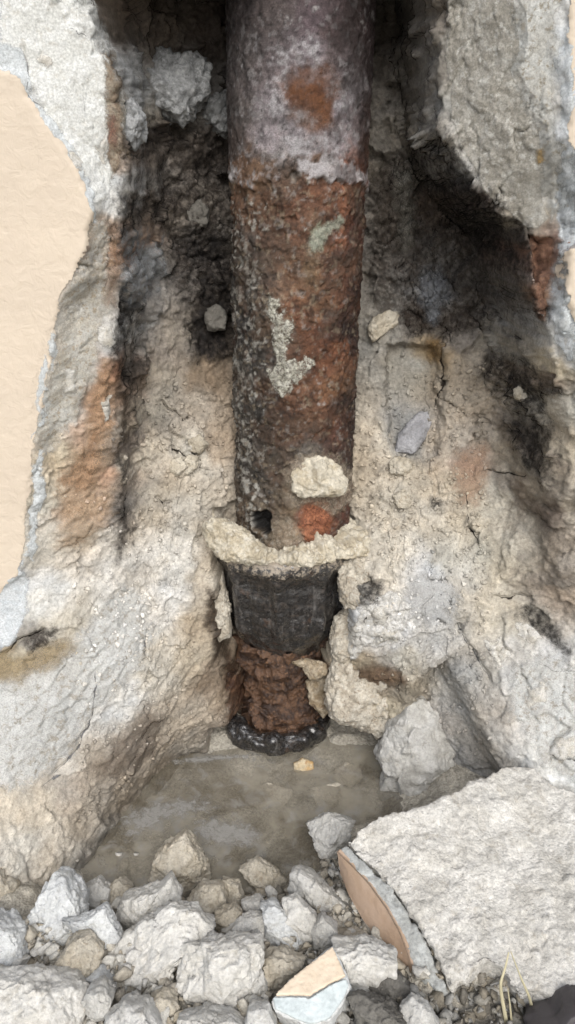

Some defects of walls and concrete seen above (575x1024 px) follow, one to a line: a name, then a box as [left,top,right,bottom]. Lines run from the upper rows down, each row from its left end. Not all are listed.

spalling [0,0,131,208]
damp [110,116,233,442]
damp [370,138,546,335]
spalling [445,0,575,361]
spalling [0,220,119,650]
damp [112,456,136,556]
rust [298,501,331,542]
damp [481,351,556,472]
spalling [0,587,153,791]
spalling [515,622,542,643]
spalling [484,635,575,783]